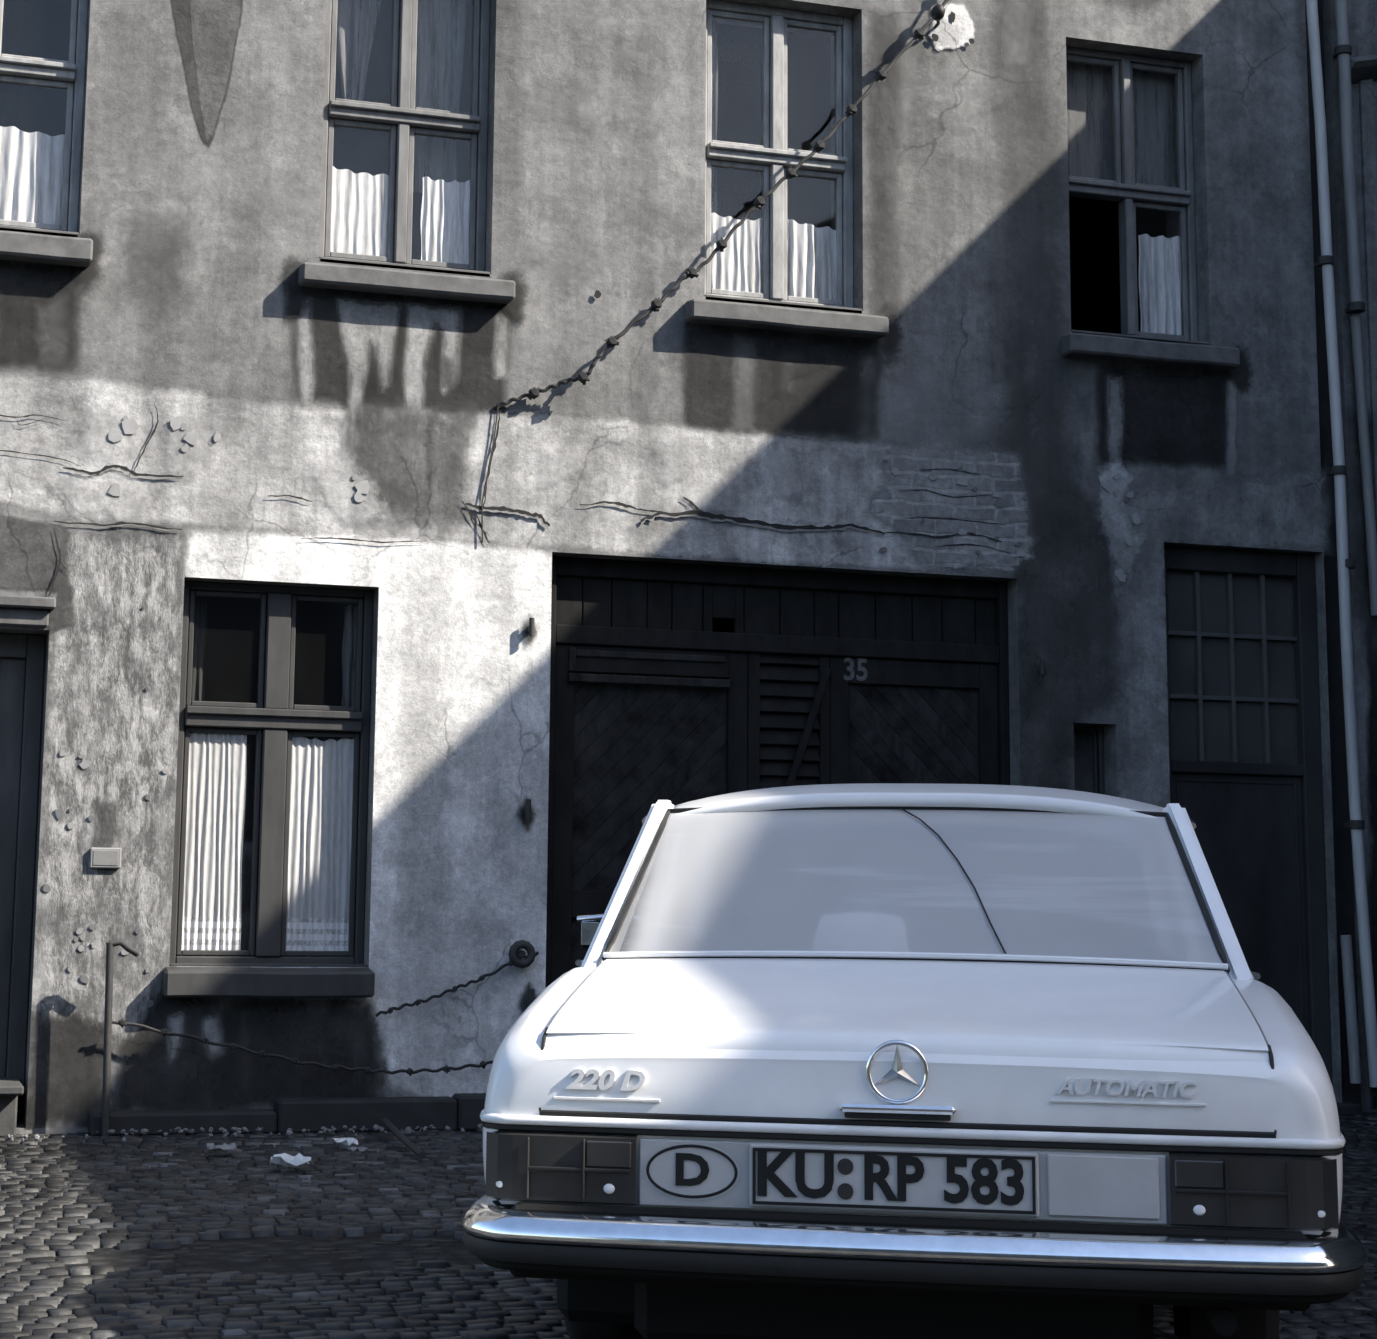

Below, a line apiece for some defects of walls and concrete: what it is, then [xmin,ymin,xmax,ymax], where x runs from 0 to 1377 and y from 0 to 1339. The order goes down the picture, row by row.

water stain [171,0,242,146]
water stain [0,260,77,369]
crack [0,404,183,479]
crack [267,494,313,502]
water stain [296,290,509,521]
crack [462,410,550,543]
water stain [685,326,880,436]
crack [580,497,1002,542]
flaking render [868,448,1033,572]
flaking render [1099,460,1145,594]
water stain [1099,366,1240,476]
water stain [1353,419,1377,1018]